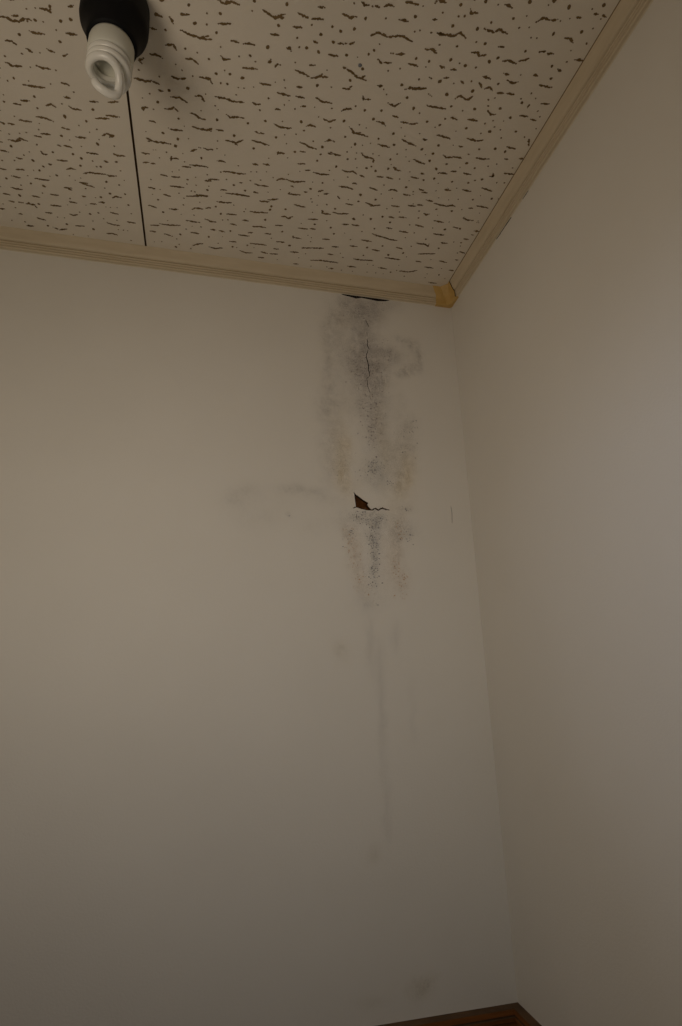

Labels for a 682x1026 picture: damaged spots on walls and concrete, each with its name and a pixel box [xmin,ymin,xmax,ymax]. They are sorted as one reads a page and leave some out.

spalling [354,492,389,511]